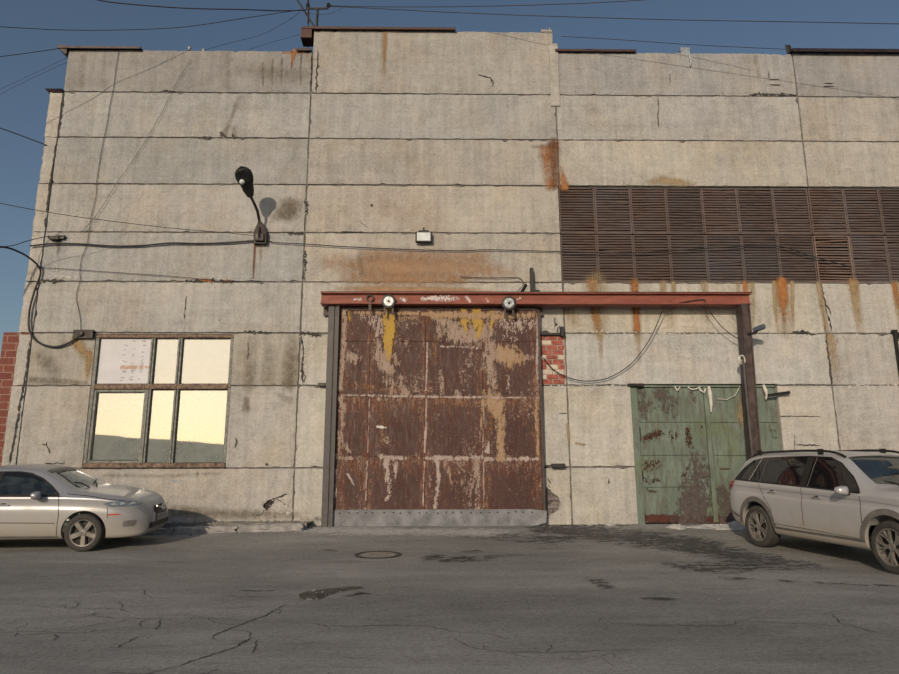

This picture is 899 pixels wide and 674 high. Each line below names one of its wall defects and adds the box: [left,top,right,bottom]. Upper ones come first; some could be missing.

corrosion [542,139,568,190]
leakage [278,199,296,218]
corrosion [772,277,794,328]
corrosion [849,280,861,324]
corrosion [591,307,603,351]
peeling [334,295,738,524]
spalling [260,498,293,516]
corrosion [645,514,728,524]
leakage [501,525,818,582]
crack [2,590,285,674]